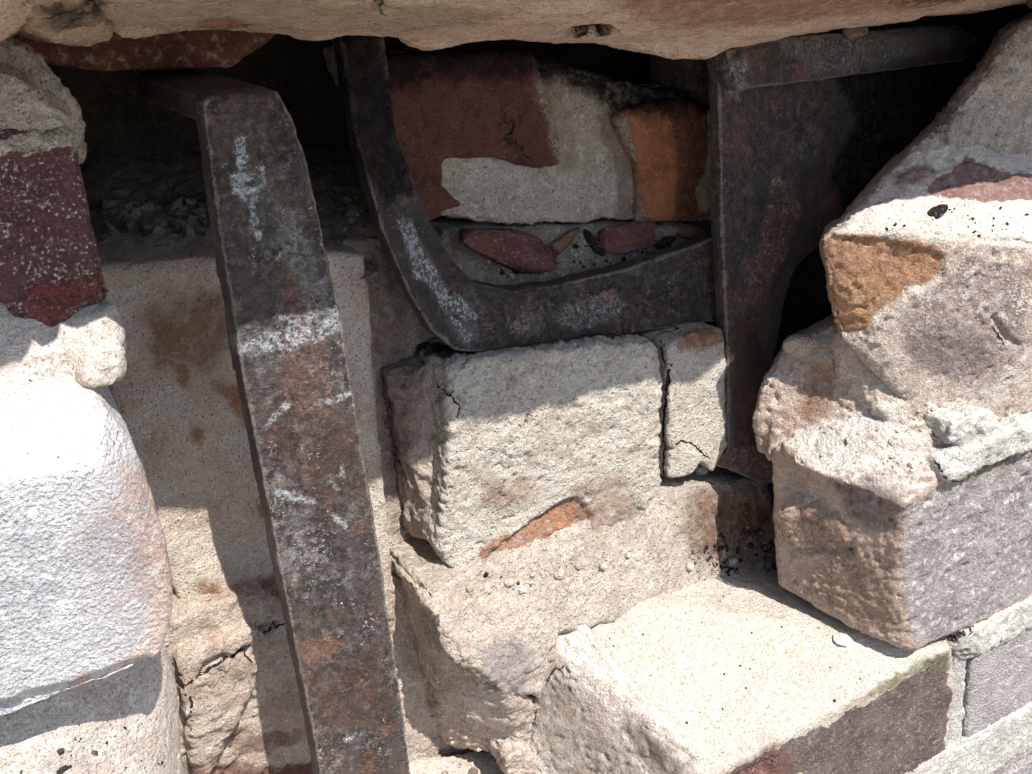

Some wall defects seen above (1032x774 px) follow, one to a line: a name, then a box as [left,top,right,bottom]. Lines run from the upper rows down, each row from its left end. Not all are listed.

crack [372,0,387,18]
crack [660,340,711,477]
corrosion [687,168,803,567]
crack [184,621,284,737]